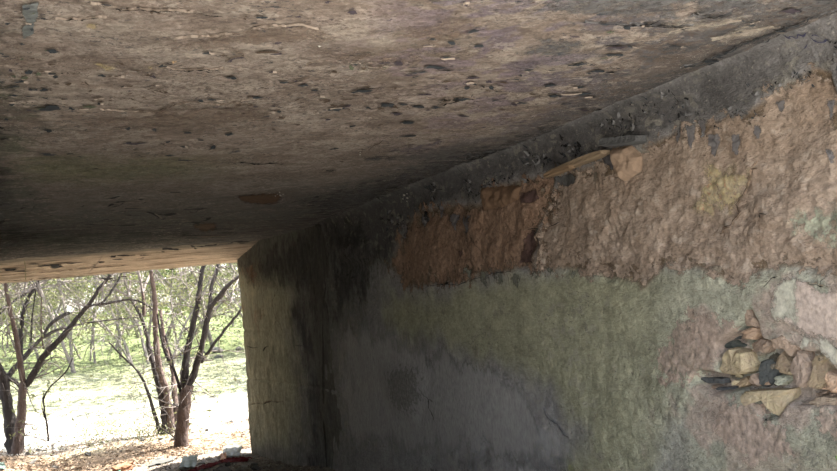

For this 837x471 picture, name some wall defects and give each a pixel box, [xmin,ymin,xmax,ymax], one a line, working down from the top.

crack [56,2,221,21]
peeling [660,4,755,36]
peeling [0,2,596,154]
spalling [384,39,837,365]
spalling [712,390,799,469]